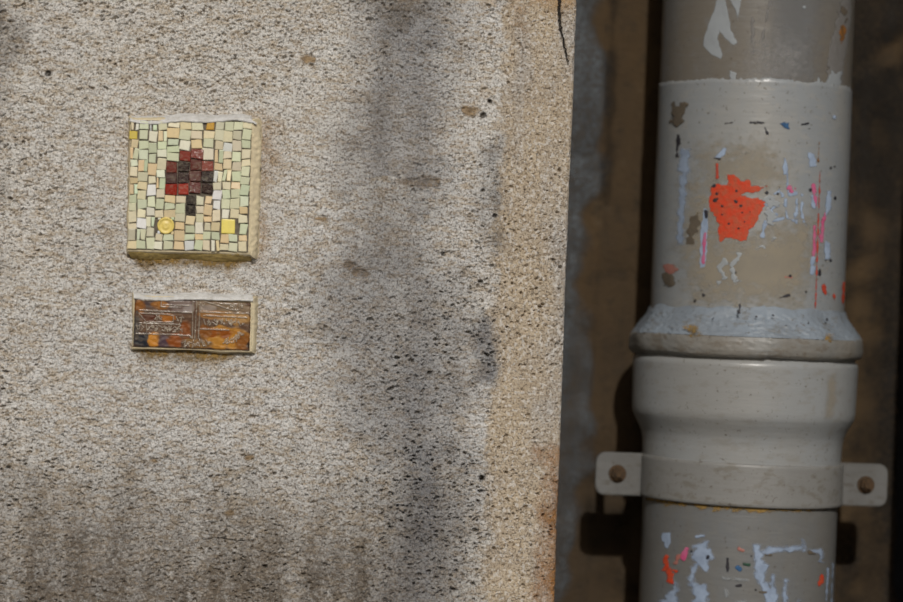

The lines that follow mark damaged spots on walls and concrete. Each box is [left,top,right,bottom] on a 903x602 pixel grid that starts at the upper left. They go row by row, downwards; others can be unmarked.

crack [557,0,569,65]
peeling [703,0,741,59]
peeling [686,158,751,264]
peeling [716,252,742,285]
peeling [660,582,679,602]
peeling [673,547,692,565]
peeling [692,582,709,602]
peeling [763,540,829,601]